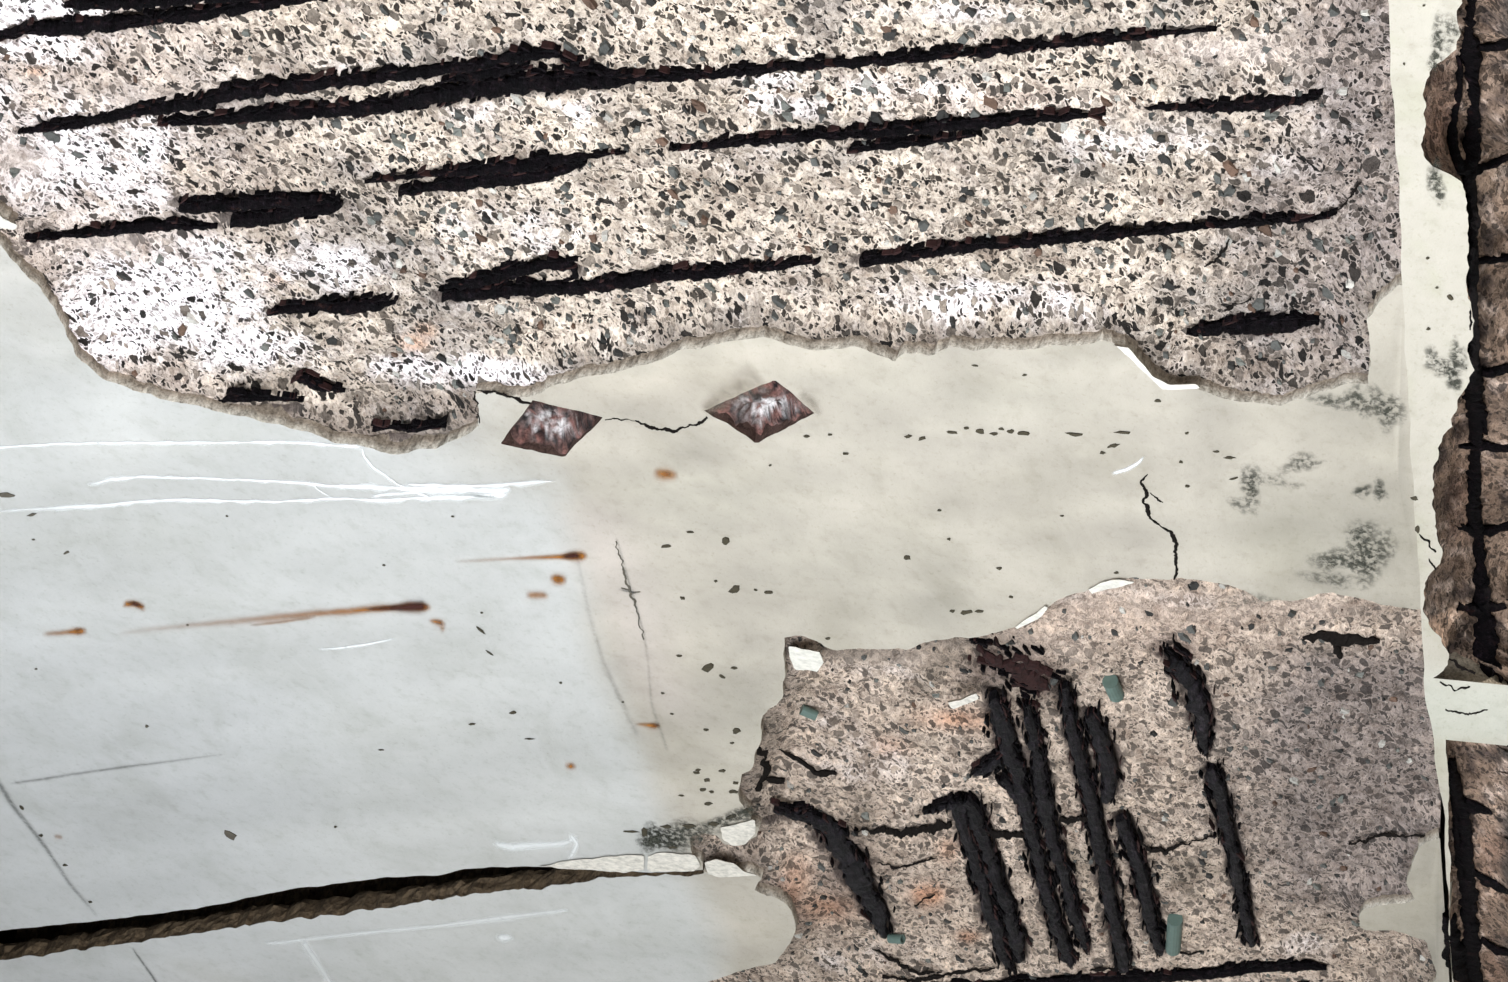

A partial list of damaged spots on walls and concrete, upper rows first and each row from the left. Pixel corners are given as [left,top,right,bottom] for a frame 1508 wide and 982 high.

spalling [0,0,1405,455]
crack [473,390,531,423]
crack [605,416,708,433]
leakage [0,441,550,509]
spalling [623,0,1508,982]
crack [1140,474,1179,580]
rust [285,603,442,625]
crack [1440,658,1488,716]